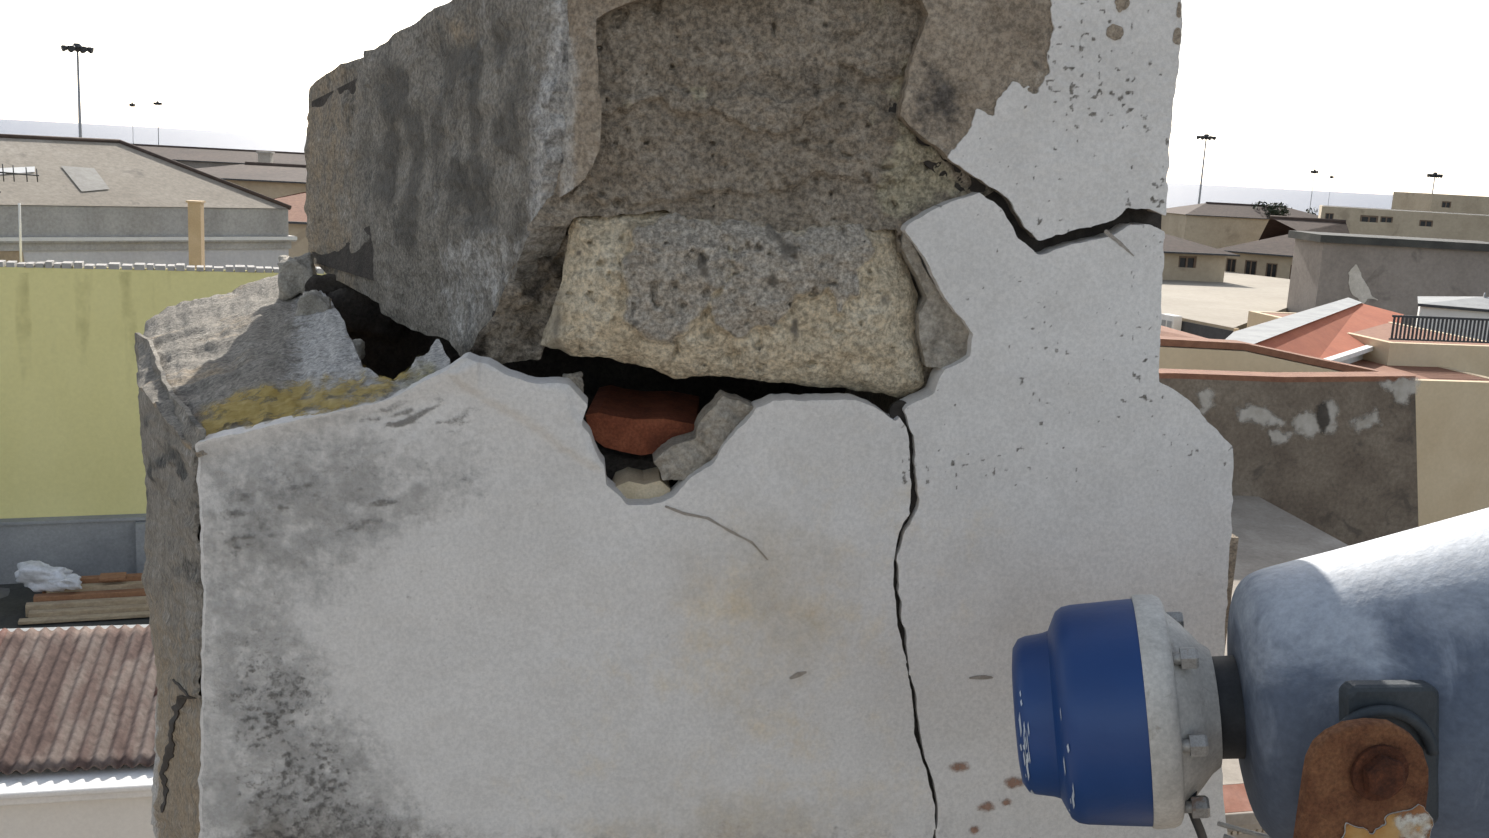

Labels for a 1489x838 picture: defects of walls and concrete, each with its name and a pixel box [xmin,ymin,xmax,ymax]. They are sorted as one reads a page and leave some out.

peeling [1106,0,1130,40]
peeling [1173,2,1181,45]
crack [888,103,1160,256]
peeling [0,251,24,263]
spalling [431,0,1053,499]
water stain [387,408,433,427]
flaking render [1198,389,1214,413]
flaking render [1239,400,1379,444]
flaking render [1381,378,1420,403]
crack [889,400,936,838]
water stain [234,658,381,838]
rust [1343,805,1433,838]